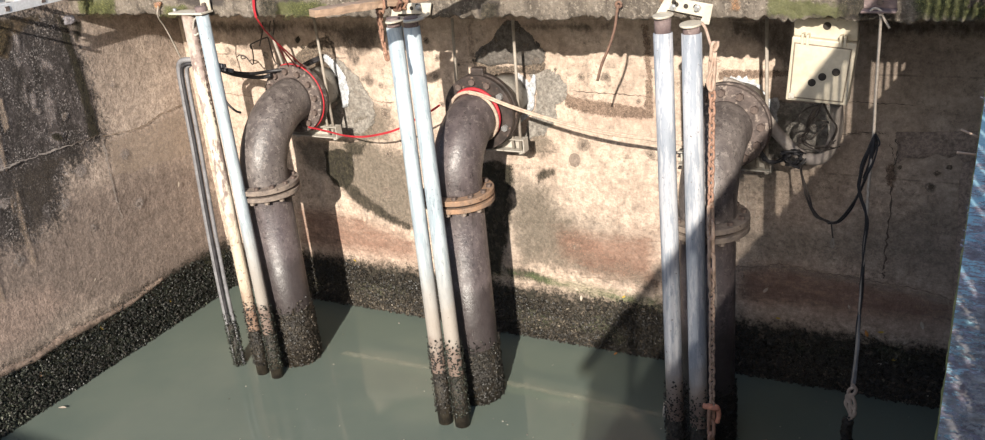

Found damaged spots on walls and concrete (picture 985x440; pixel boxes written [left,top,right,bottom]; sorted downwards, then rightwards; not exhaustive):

crack [0,134,122,216]
crack [843,132,898,278]